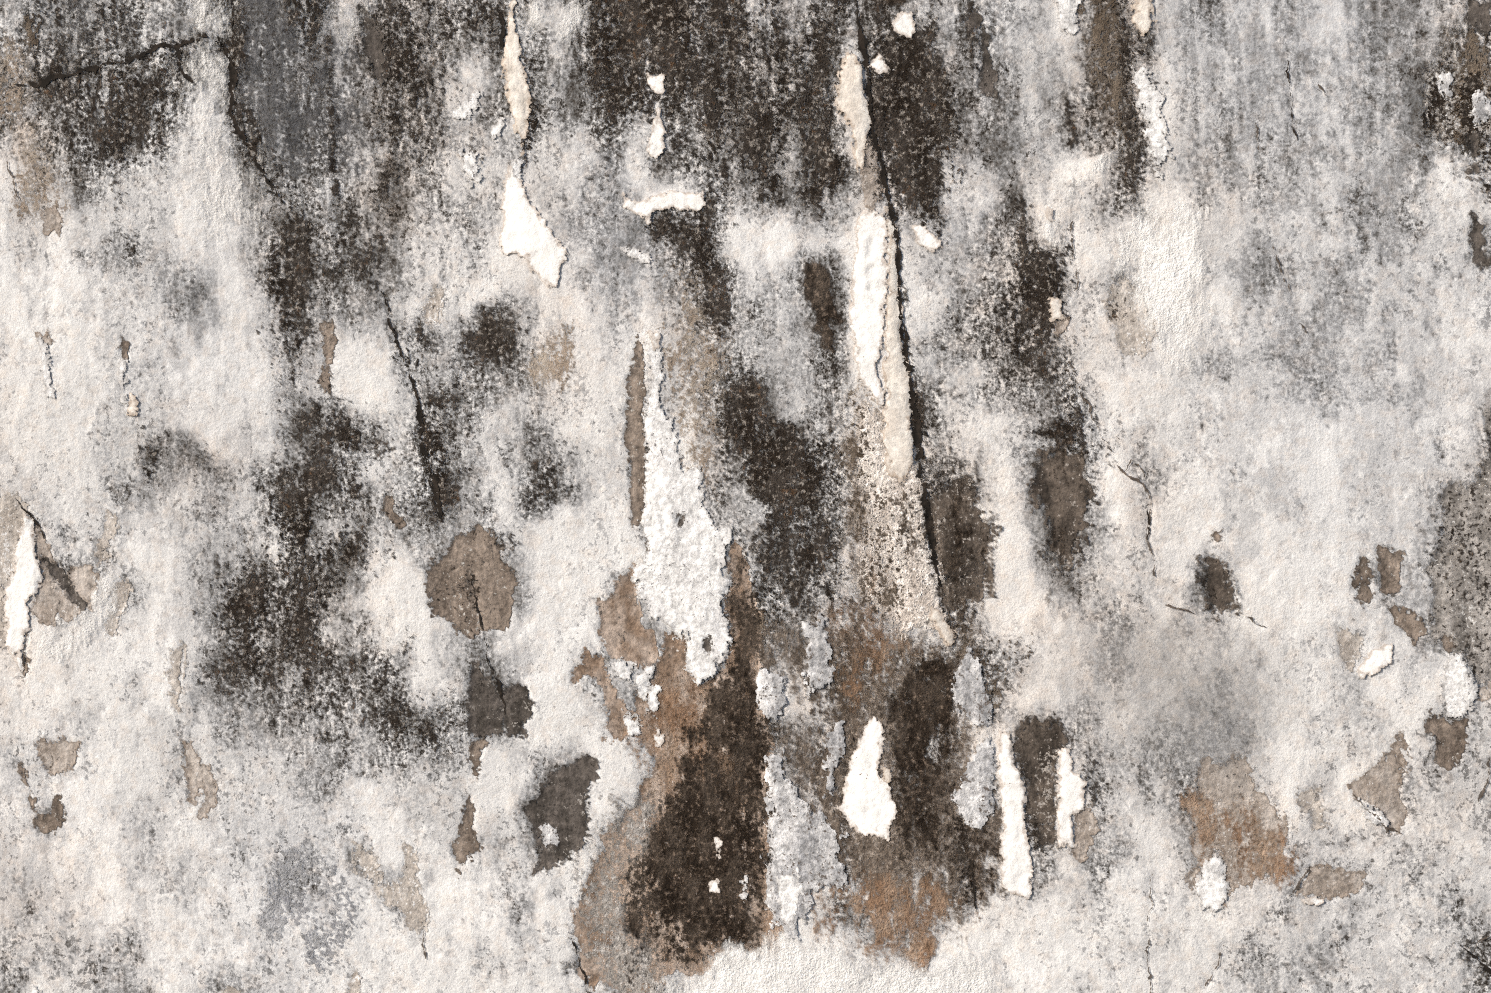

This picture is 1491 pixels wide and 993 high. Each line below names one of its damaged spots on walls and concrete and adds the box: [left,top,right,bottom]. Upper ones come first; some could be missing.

crack [7,0,284,204]
spalling [0,492,134,678]
water stain [0,0,579,776]
crack [380,291,445,522]
crack [471,580,506,715]
spalling [452,656,536,875]
peeling [513,330,1003,993]
water stain [567,0,1033,986]
crack [847,0,956,640]
water stain [943,193,1120,490]
water stain [1009,712,1107,856]
spalling [1335,407,1491,771]